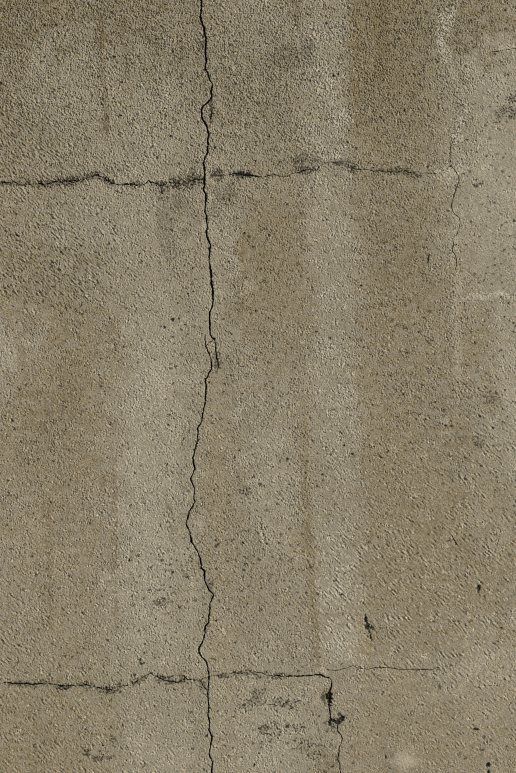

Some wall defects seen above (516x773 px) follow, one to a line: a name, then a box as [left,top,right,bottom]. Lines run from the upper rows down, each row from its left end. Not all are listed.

crack [0,0,436,258]
crack [4,264,224,773]
crack [215,668,343,758]
crack [327,664,447,672]